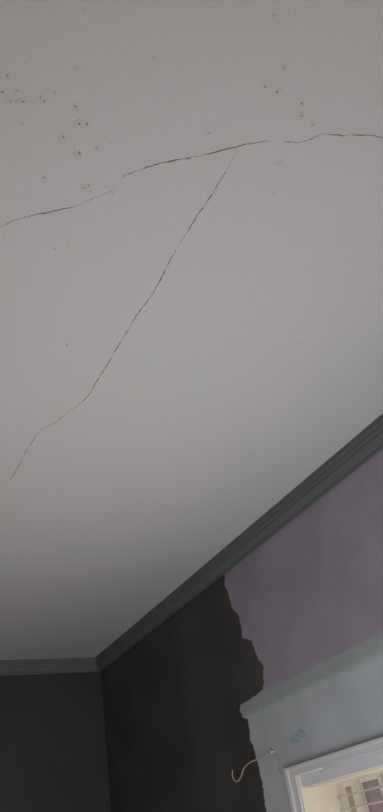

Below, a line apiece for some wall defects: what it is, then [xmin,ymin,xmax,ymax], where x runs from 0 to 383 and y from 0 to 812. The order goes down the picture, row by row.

crack [286,133,383,143]
crack [5,141,264,478]